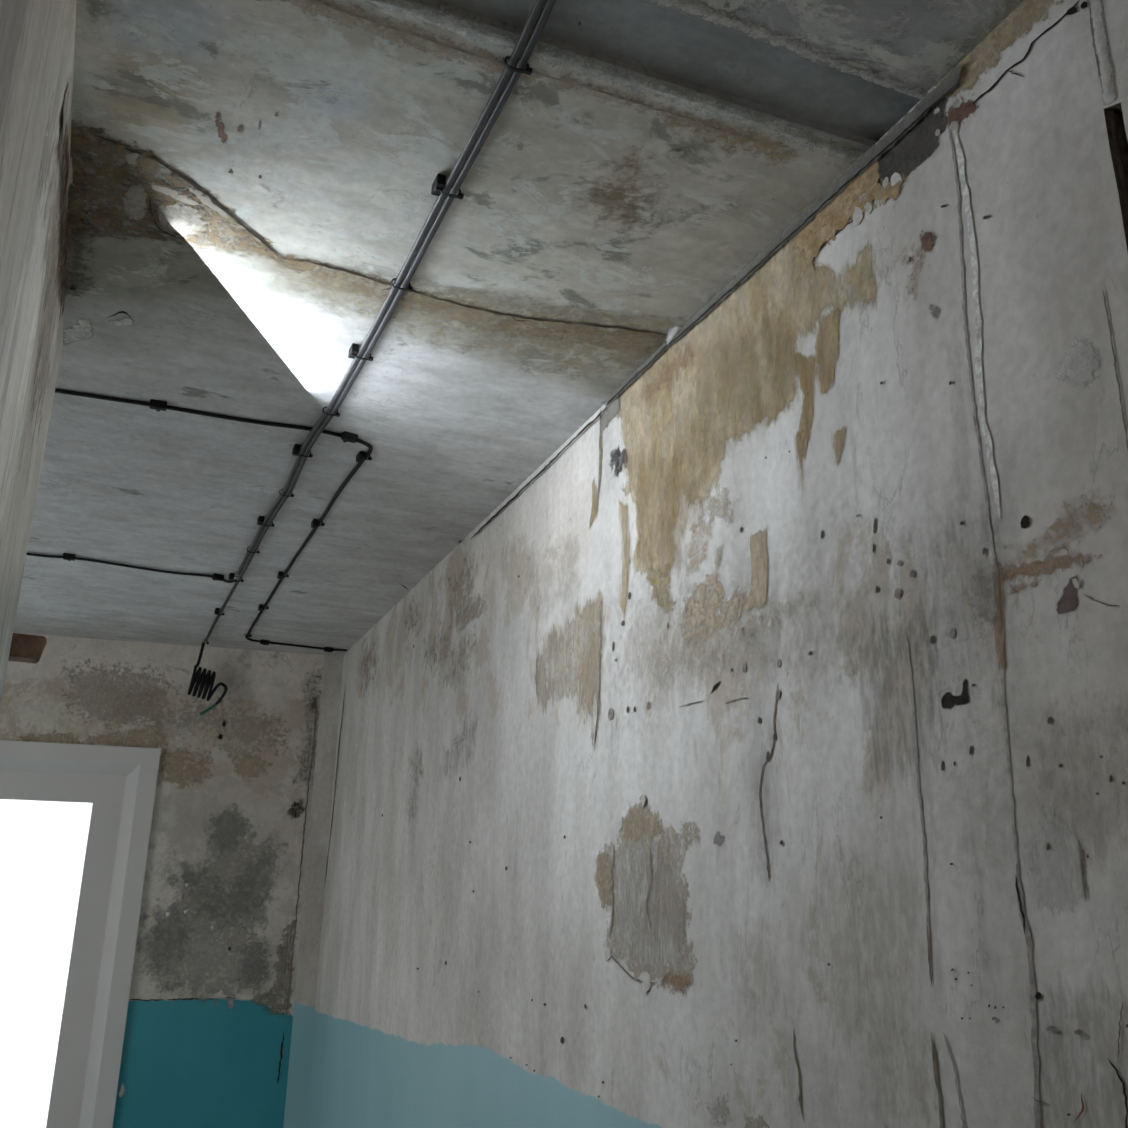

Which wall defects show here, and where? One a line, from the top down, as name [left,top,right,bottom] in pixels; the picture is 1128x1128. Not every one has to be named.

flaking render [30,82,307,438]
spalling [281,0,906,270]
crack [279,0,1087,543]
peeling [646,0,1064,136]
damp [139,804,287,1008]
peeling [595,793,700,996]